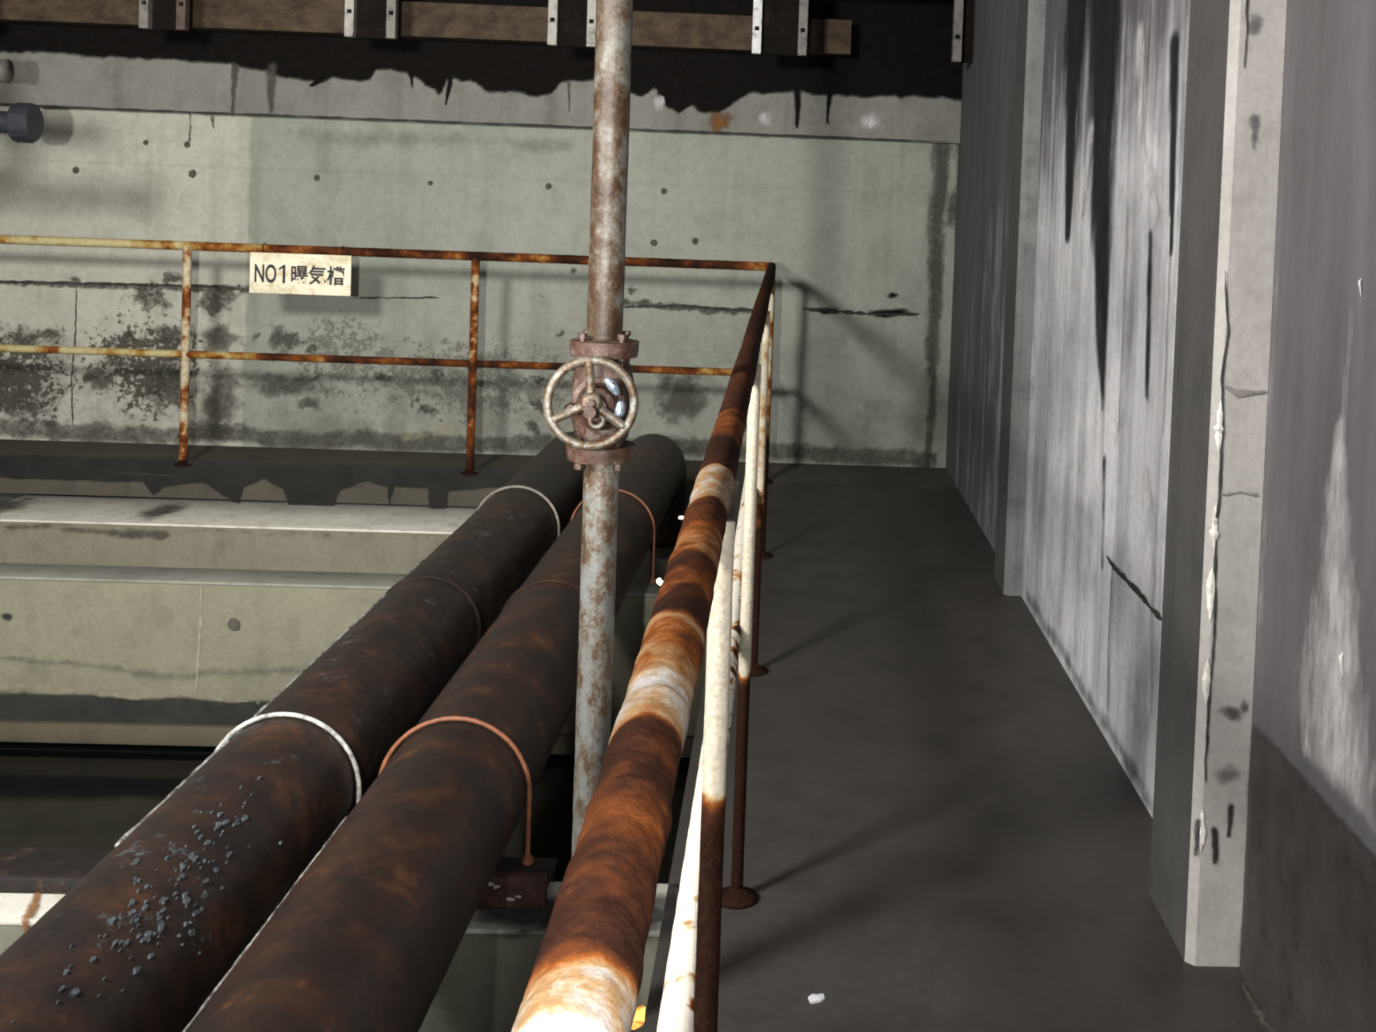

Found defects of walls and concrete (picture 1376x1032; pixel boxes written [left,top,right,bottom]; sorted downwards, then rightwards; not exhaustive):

leakage [0,684,269,725]
leakage [0,272,552,539]
crack [1106,555,1161,708]
crack [1204,271,1267,780]